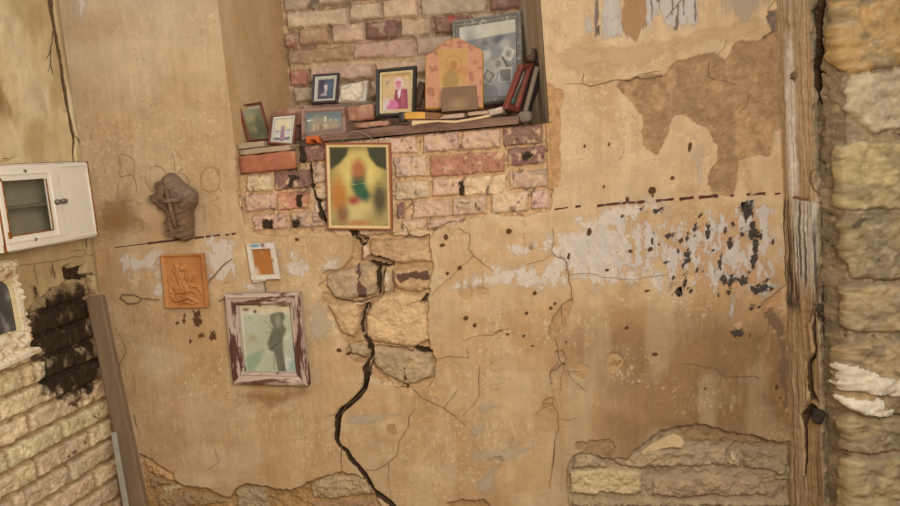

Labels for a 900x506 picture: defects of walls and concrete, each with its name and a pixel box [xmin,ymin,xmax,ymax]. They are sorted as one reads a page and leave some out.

crack [46,0,80,161]
flaking render [617,11,779,197]
crack [708,41,751,111]
flaking render [0,317,123,506]
flaking render [26,266,98,332]
crack [310,164,327,222]
crack [330,200,508,506]
flaking render [640,432,684,454]
flaking render [667,206,781,311]
crack [802,0,826,474]